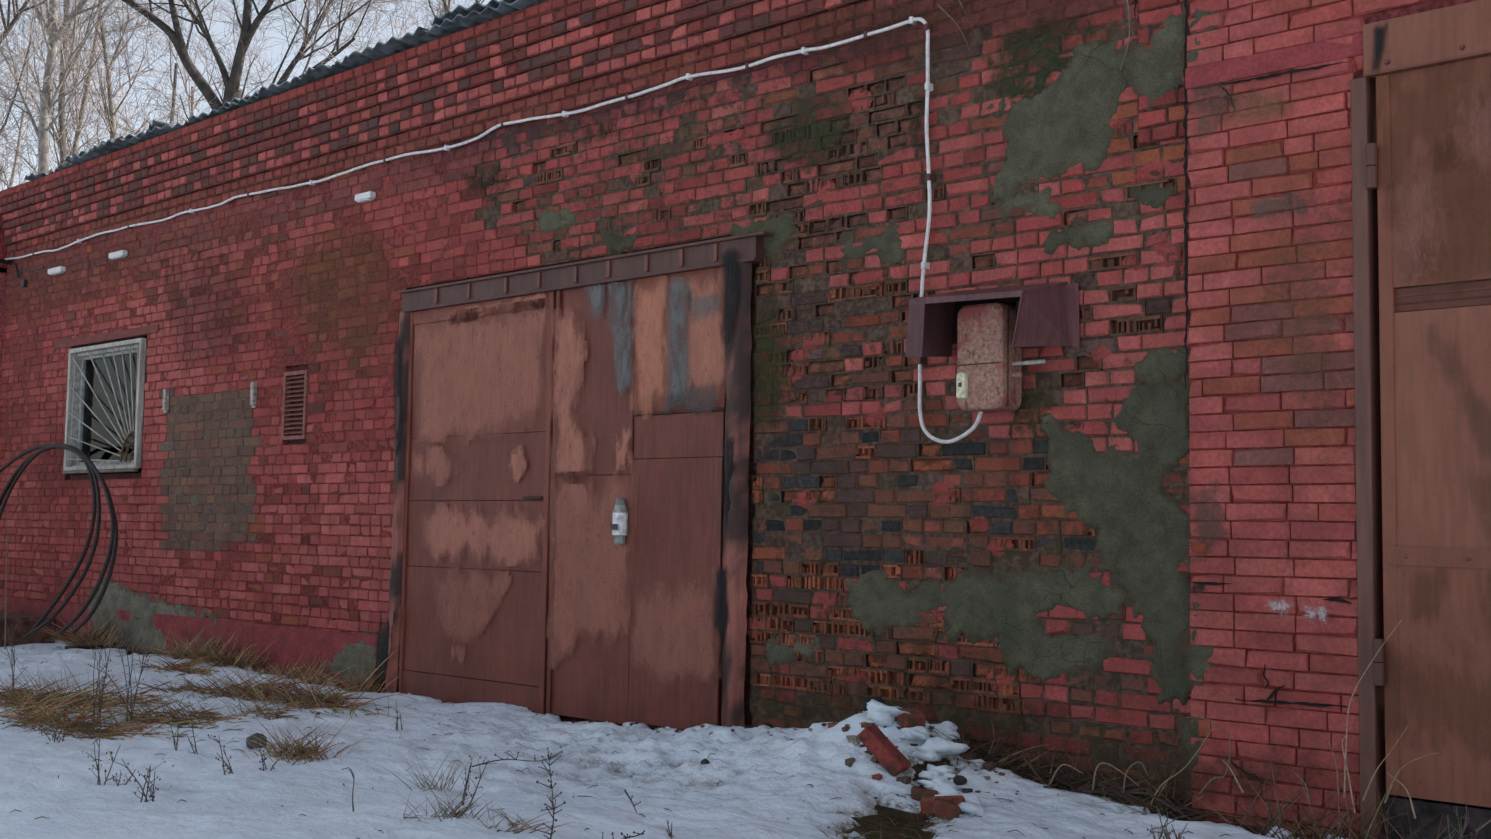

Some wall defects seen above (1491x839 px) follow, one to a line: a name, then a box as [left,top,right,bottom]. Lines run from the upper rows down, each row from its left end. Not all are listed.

spalling [1109,118,1177,202]
spalling [925,185,945,202]
spalling [694,63,934,459]
spalling [1063,239,1189,387]
spalling [752,476,764,504]
spalling [784,476,838,509]
spalling [912,443,961,508]
spalling [968,516,1036,557]
spalling [881,550,926,578]